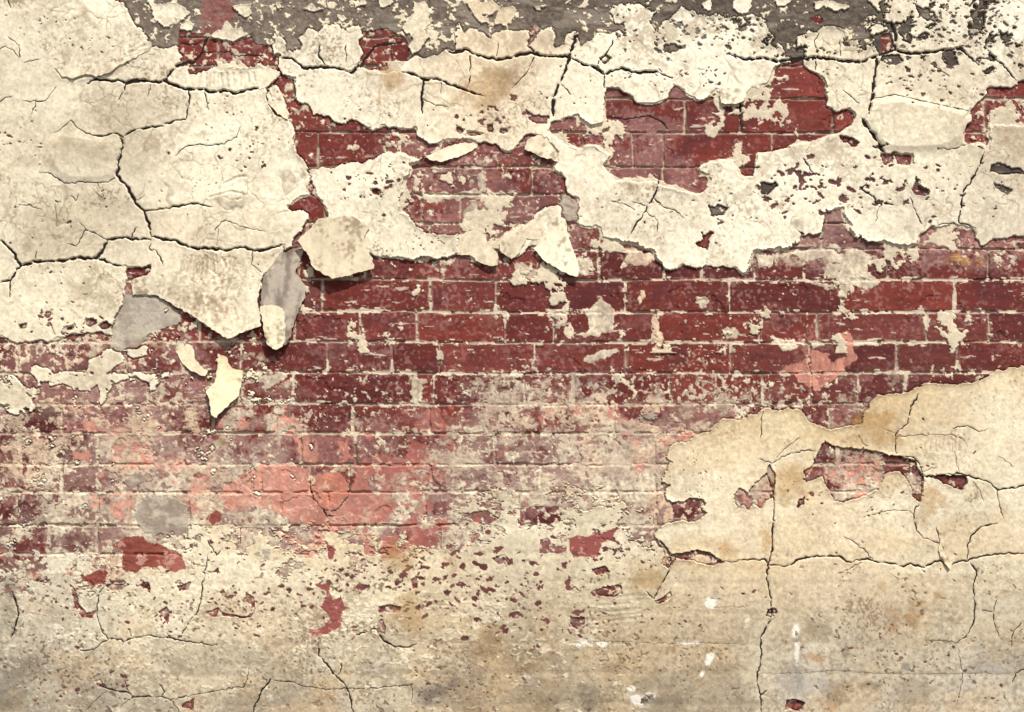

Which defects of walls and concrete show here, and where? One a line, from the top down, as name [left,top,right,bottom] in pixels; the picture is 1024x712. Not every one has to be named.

crack [401,35,671,117]
crack [0,33,402,297]
peeling [54,0,1024,350]
crack [726,23,1017,228]
peeling [176,343,243,418]
peeling [113,536,186,574]
crack [78,527,241,651]
peeling [206,463,403,556]
spalling [659,496,708,524]
crack [573,393,1024,712]
spalling [803,441,968,509]
crack [88,641,413,712]